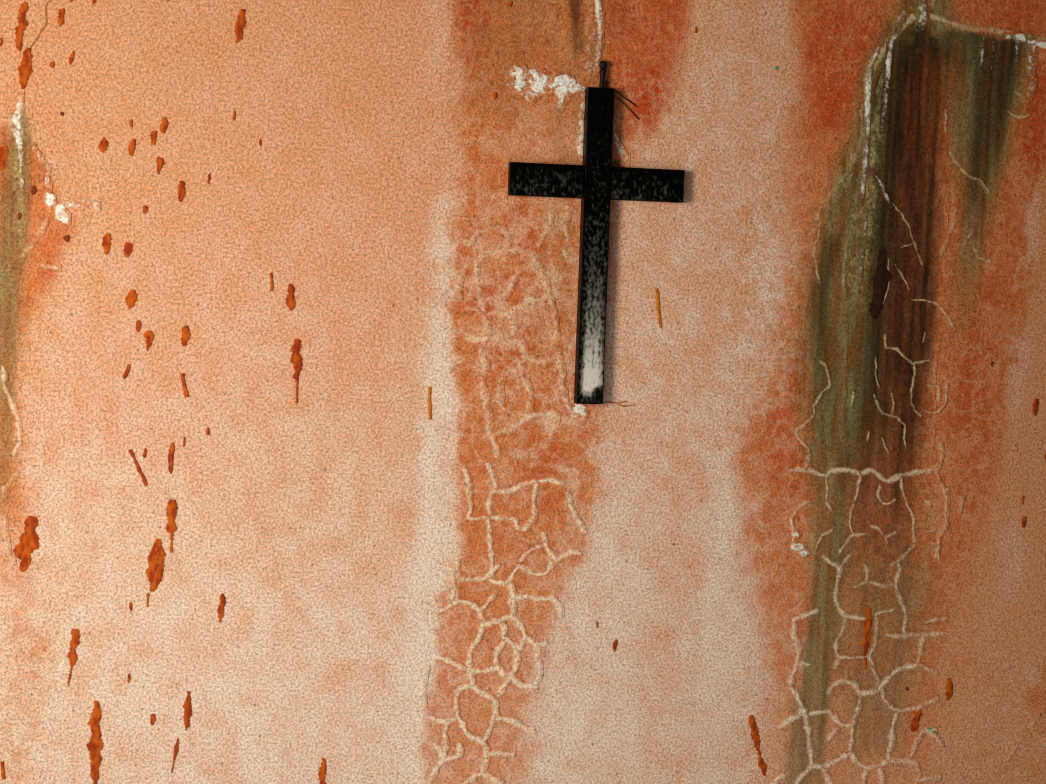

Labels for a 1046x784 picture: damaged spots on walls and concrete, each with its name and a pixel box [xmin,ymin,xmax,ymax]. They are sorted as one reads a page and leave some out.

water stain [1,91,101,284]
water stain [500,0,605,165]
water stain [613,97,630,167]
water stain [835,0,937,319]
crack [943,109,990,195]
water stain [977,31,1046,105]
crack [1006,89,1030,120]
rust [0,104,88,784]
crack [411,204,632,784]
water stain [572,403,589,417]
crack [769,202,991,784]
rust [716,0,1046,784]